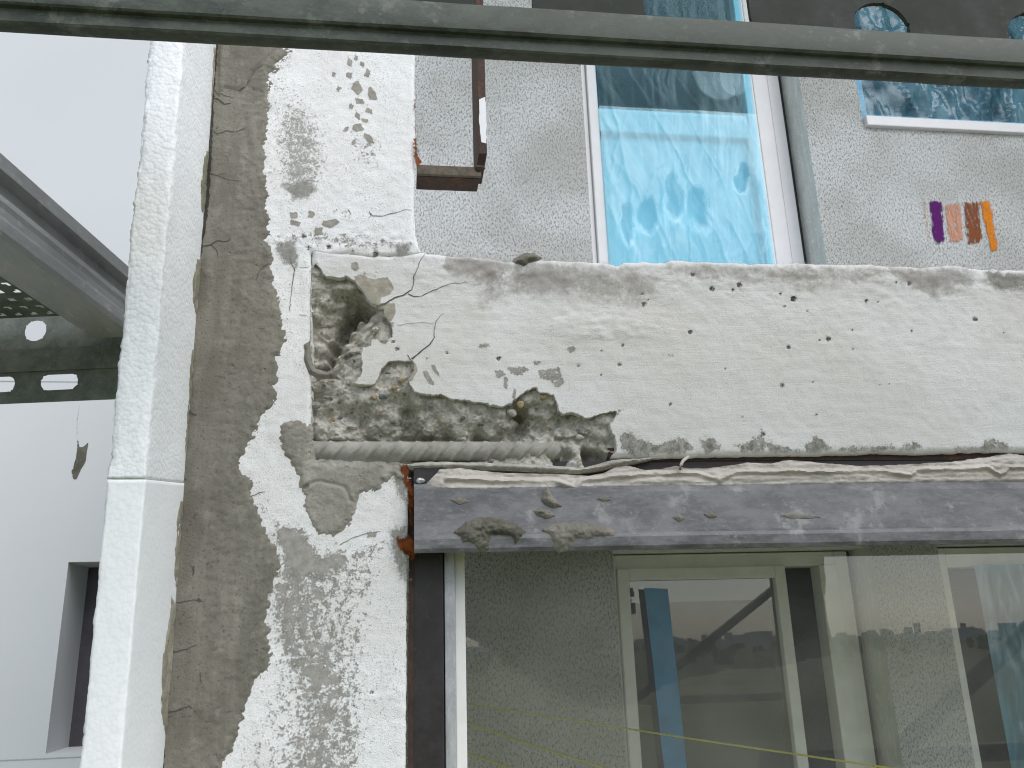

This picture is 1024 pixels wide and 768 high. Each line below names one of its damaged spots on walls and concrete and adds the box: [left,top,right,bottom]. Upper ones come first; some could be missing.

peeling [332,55,381,173]
crack [376,254,463,308]
crack [402,315,441,368]
spalling [734,429,921,453]
spalling [956,438,1012,452]
corrosion [395,463,419,560]
spalling [242,211,721,768]